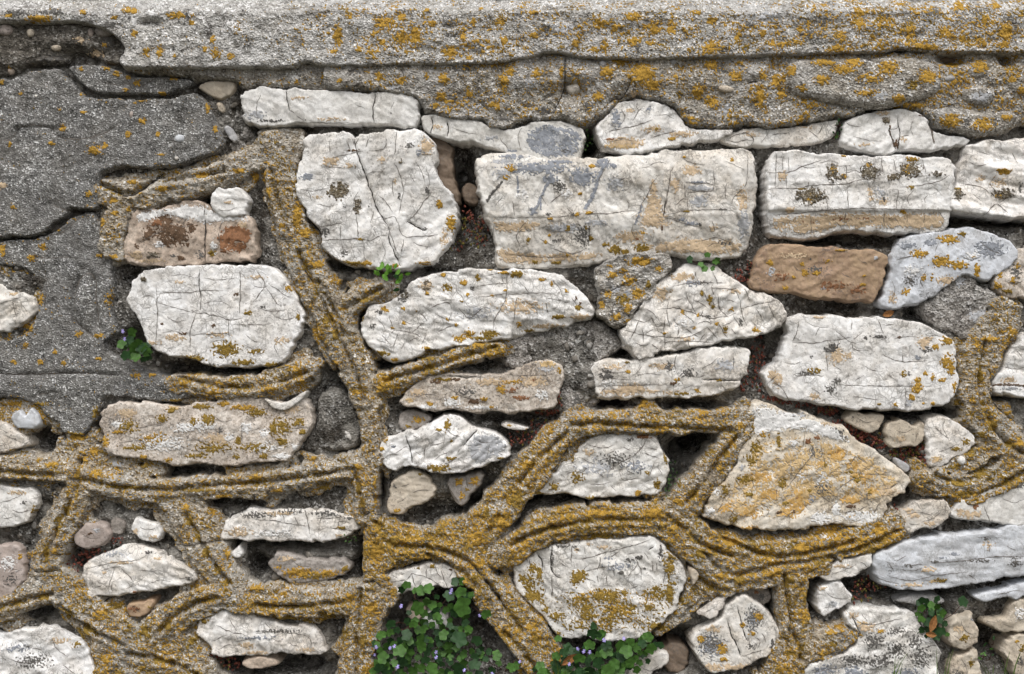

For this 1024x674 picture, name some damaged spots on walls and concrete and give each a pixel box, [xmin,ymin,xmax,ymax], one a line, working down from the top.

crack [0,167,294,354]